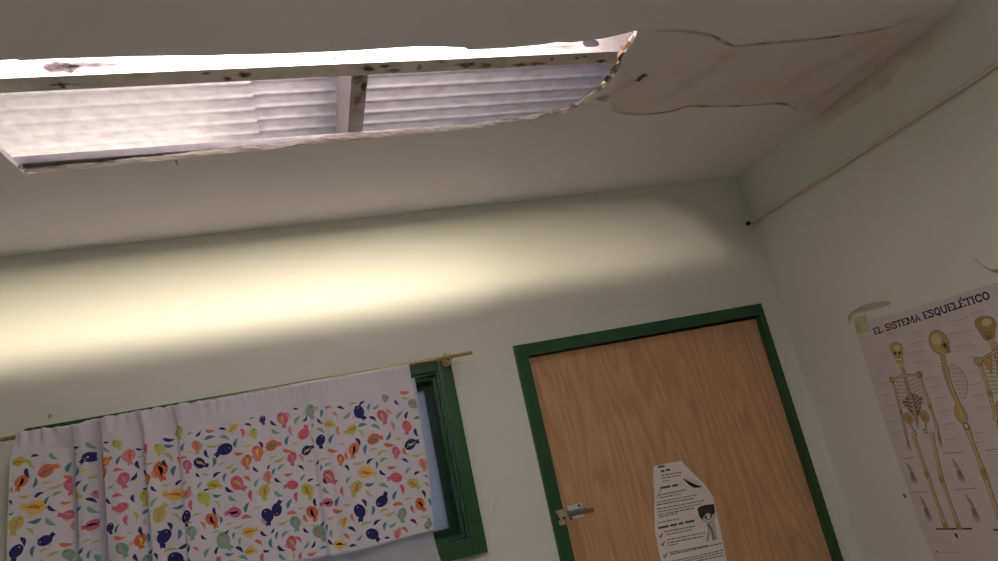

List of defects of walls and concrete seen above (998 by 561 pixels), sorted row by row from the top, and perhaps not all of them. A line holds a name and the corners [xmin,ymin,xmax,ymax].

flaking render [17,33,636,174]
corrosion [354,65,400,104]
damp [598,11,951,117]